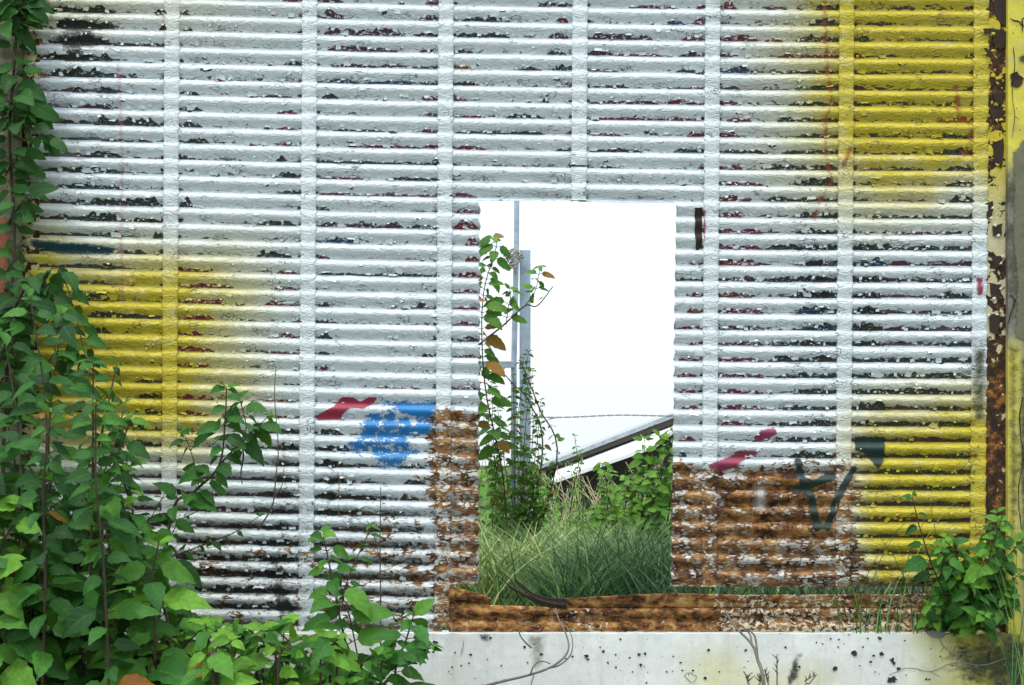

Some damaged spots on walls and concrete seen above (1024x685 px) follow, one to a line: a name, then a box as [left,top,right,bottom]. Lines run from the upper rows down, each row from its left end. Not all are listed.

peeling [41,4,167,457]
peeling [181,250,251,380]
peeling [223,59,302,206]
peeling [232,213,302,338]
peeling [315,0,706,404]
peeling [676,2,839,459]
peeling [851,102,1024,450]
peeling [183,510,301,620]
rust [320,507,394,548]
peeling [314,417,429,542]
rust [405,418,478,613]
rust [673,467,851,585]